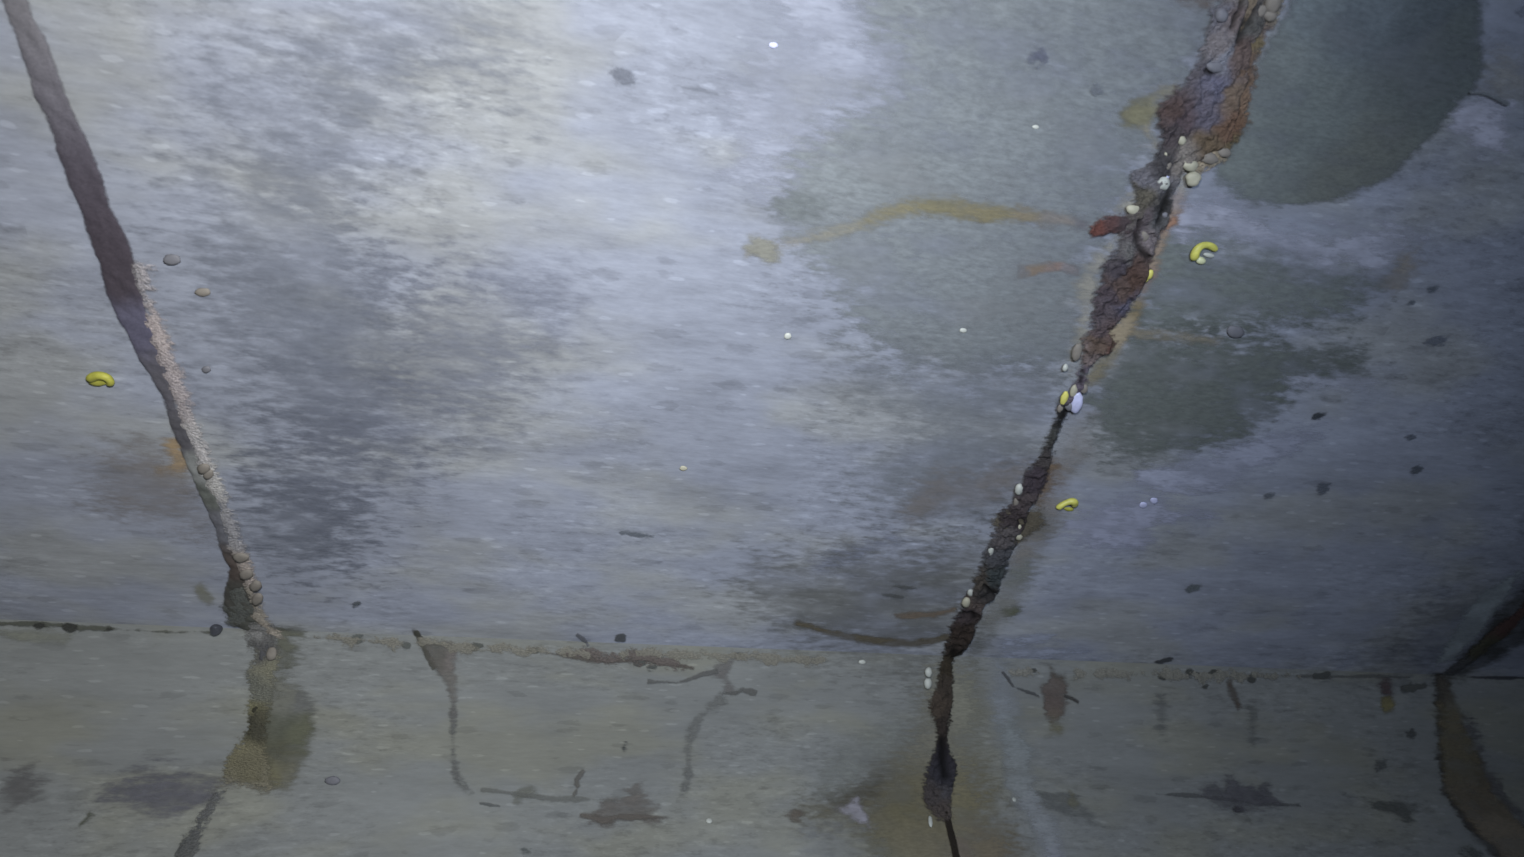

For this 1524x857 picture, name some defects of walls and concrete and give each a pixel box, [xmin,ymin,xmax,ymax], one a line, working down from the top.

water stain [274,627,303,668]
crack [0,0,826,857]
water stain [719,0,1223,376]
crack [923,0,1524,857]
water stain [1063,0,1515,549]